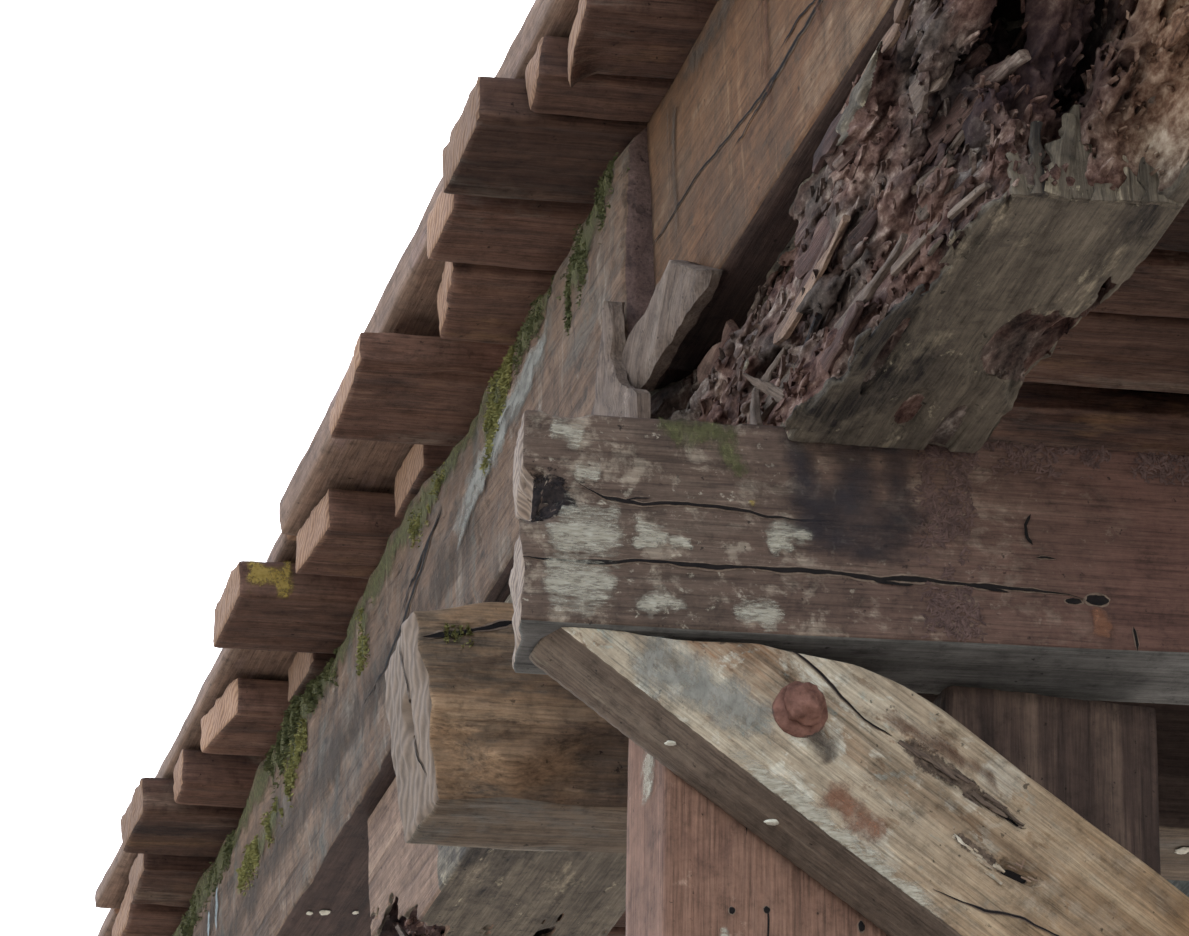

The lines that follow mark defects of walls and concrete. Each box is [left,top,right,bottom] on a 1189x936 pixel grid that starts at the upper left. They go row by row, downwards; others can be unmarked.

peeling [1006,105,1183,210]
peeling [742,373,785,425]
crack [574,480,831,523]
crack [1024,514,1056,560]
crack [523,556,1085,600]
crack [365,503,512,703]
crack [791,651,892,736]
crack [414,735,426,774]
crack [933,889,1059,936]